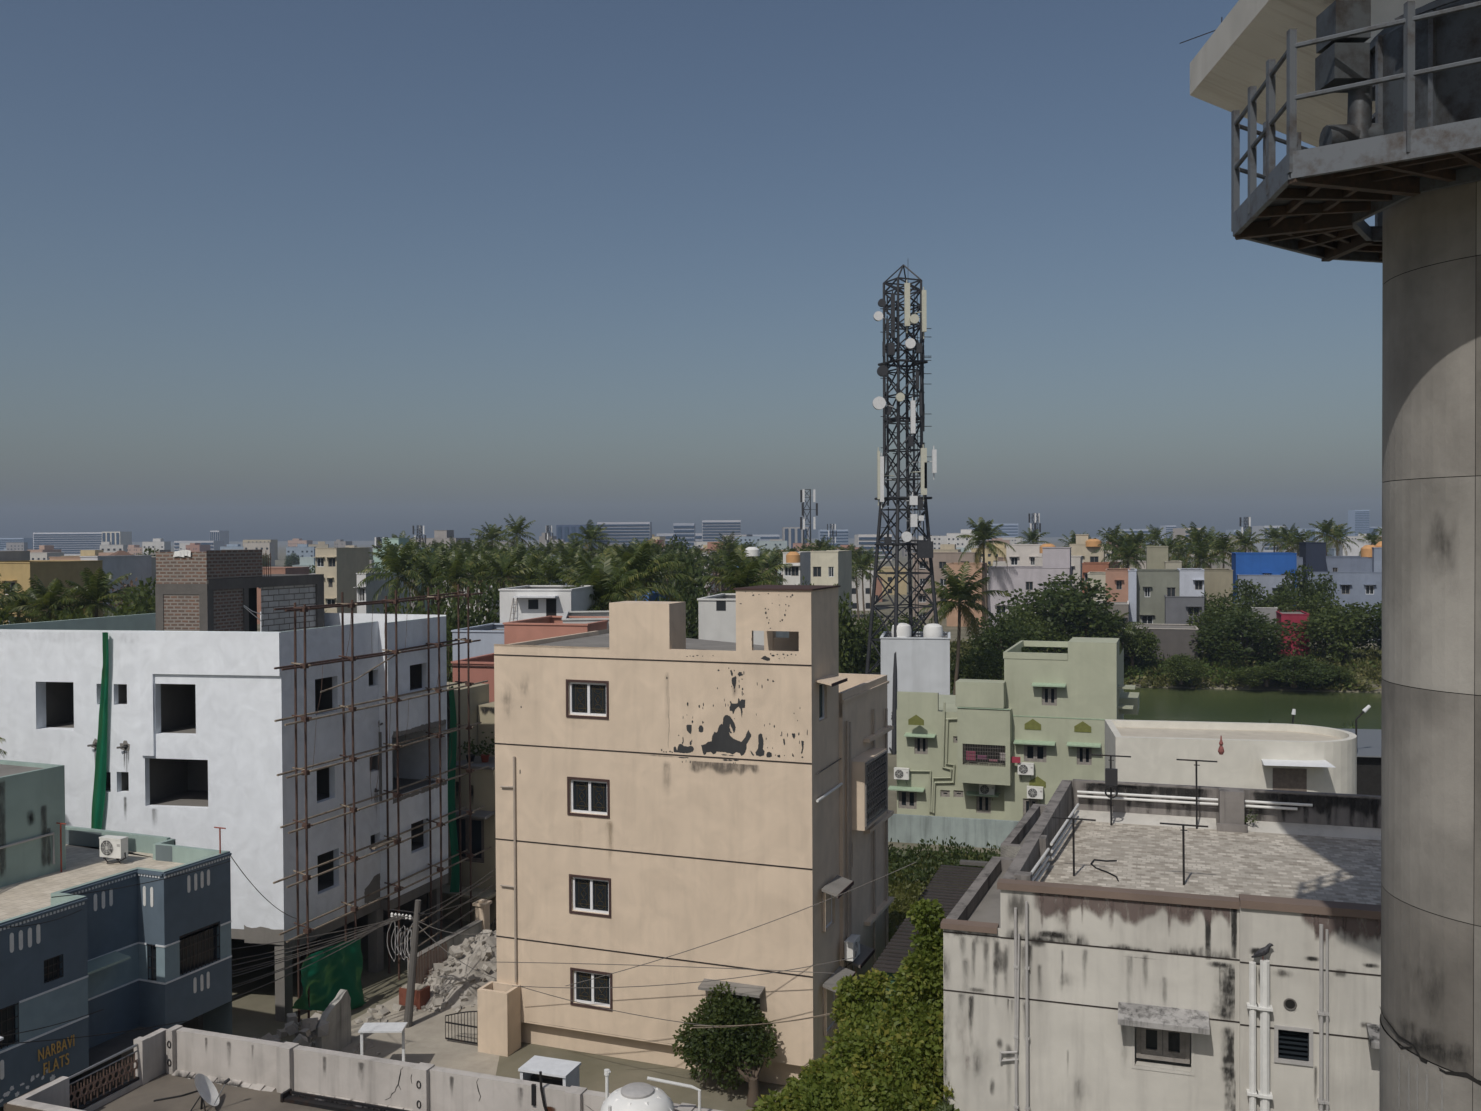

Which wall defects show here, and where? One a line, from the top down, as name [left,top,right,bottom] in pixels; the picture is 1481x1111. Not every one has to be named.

peeling [661,667,808,764]
water stain [1303,913,1381,961]
water stain [960,893,1259,1111]